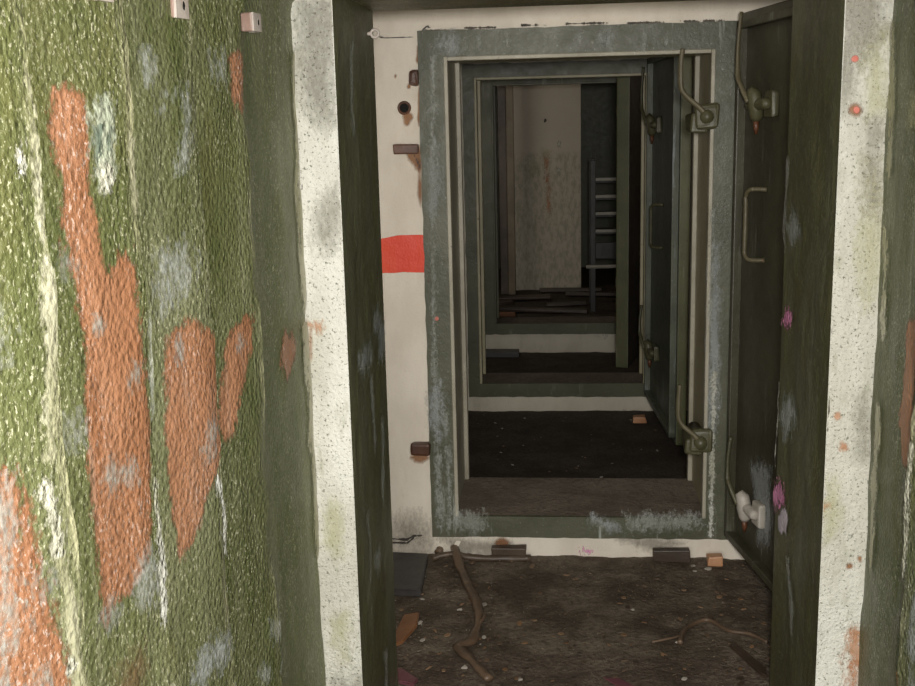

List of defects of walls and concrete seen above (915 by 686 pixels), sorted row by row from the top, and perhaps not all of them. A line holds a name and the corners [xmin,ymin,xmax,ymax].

rust [407,148,422,202]